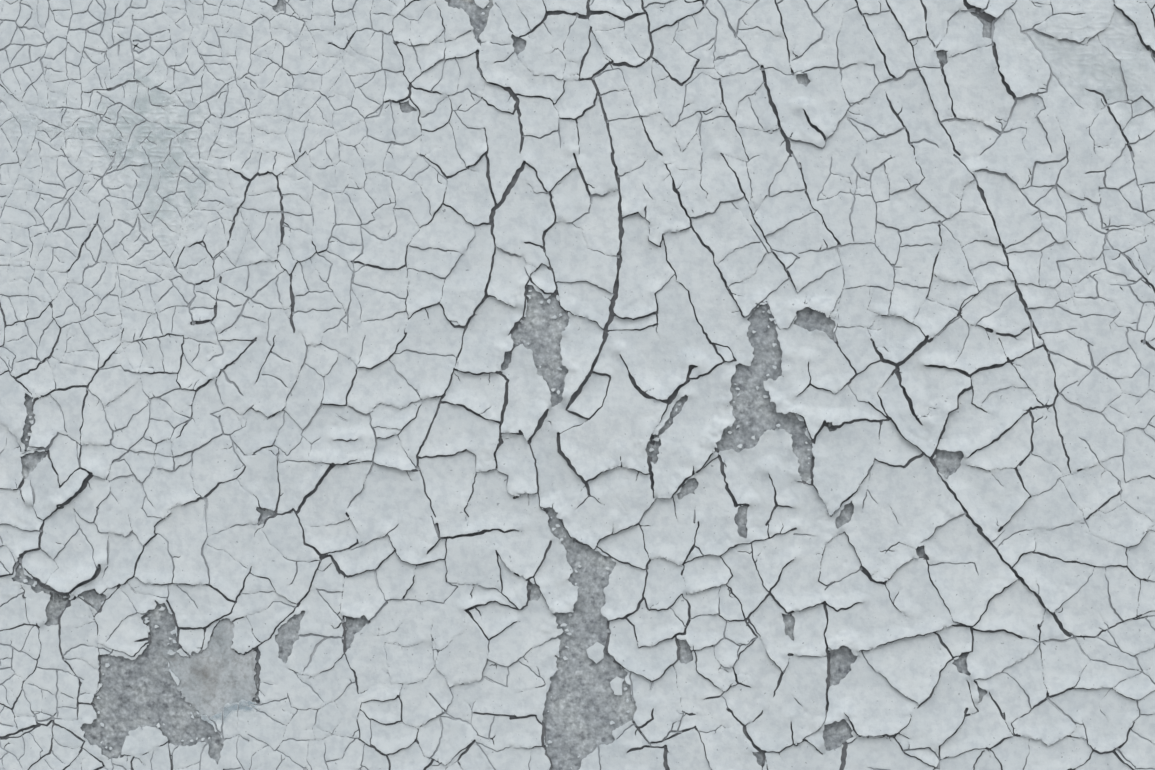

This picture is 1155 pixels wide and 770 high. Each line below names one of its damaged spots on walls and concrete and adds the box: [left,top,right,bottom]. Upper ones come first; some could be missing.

crack [0,0,324,185]
peeling [435,0,576,103]
crack [1114,2,1155,62]
peeling [446,213,987,770]
peeling [0,530,370,770]
crack [290,589,359,705]
crack [322,625,553,770]
crack [466,541,562,692]
crack [559,448,861,770]
crack [839,714,869,770]
crack [818,531,907,610]
crack [878,668,1155,770]